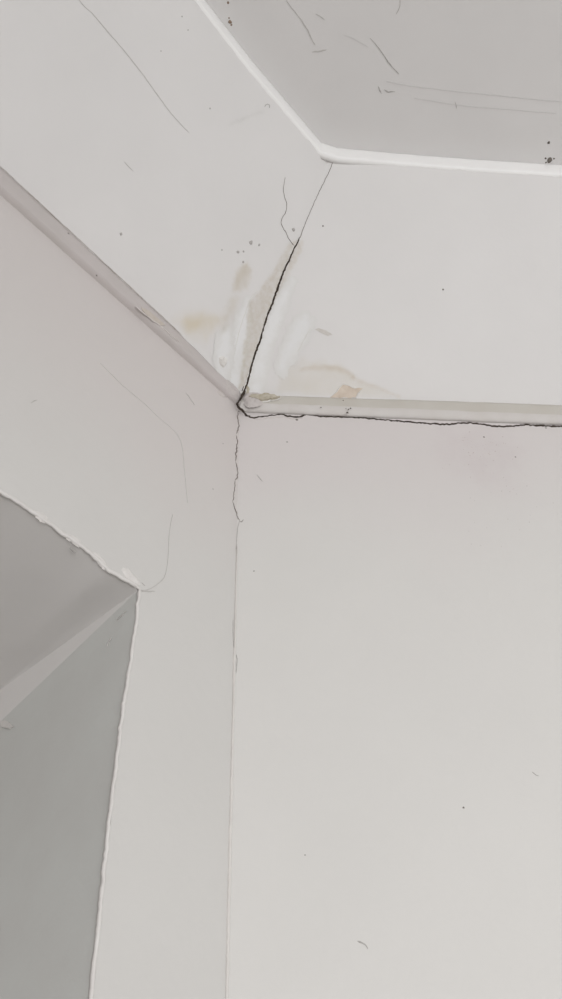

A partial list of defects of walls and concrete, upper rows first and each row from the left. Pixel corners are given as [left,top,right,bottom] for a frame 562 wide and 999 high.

crack [232,165,562,545]